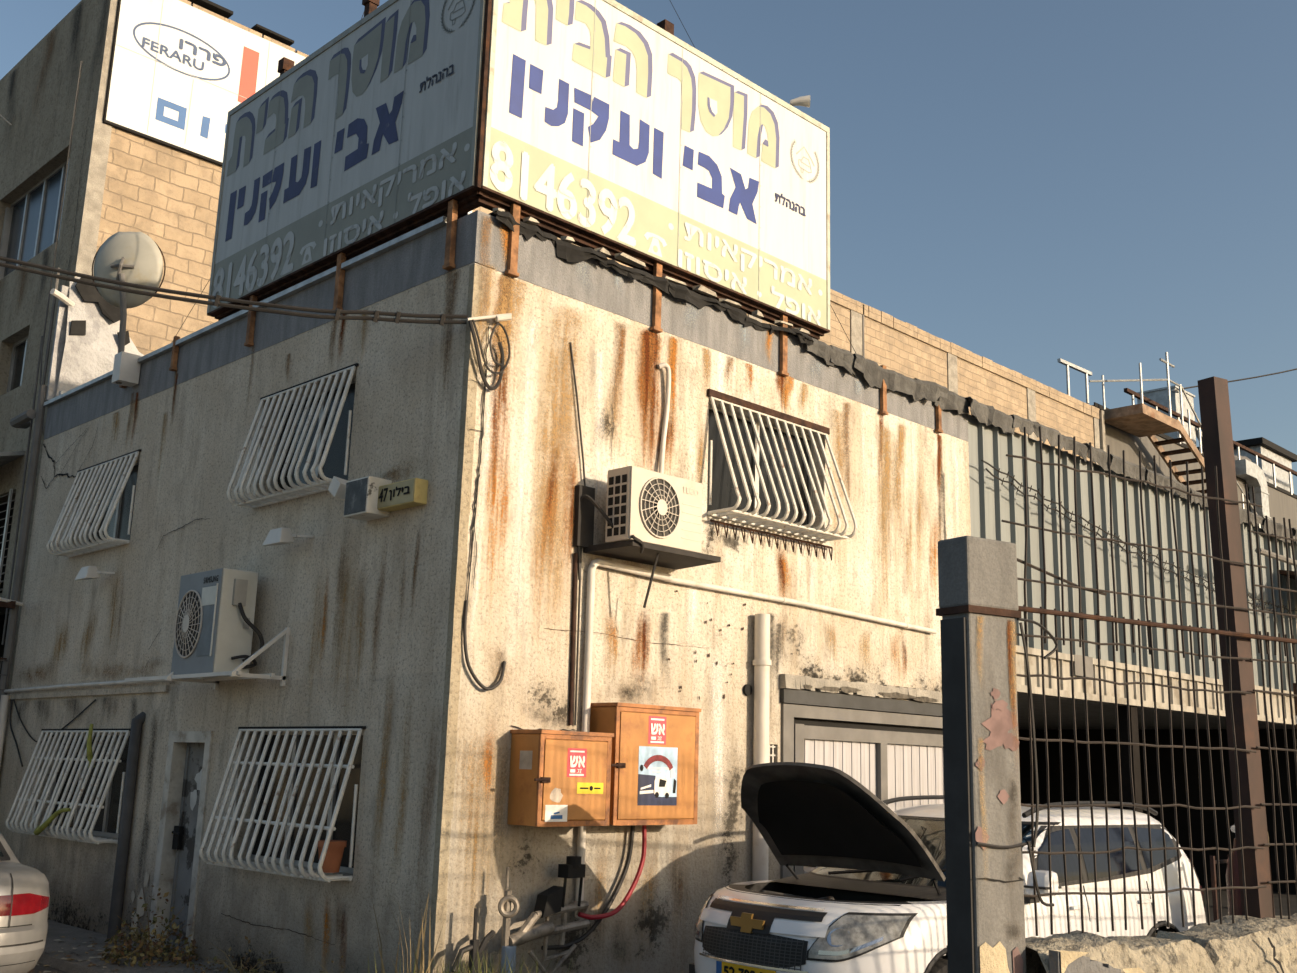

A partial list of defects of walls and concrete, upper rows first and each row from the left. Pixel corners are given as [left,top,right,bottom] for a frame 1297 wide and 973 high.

corrosion [609,324,625,428]
corrosion [639,329,677,453]
crack [42,424,99,489]
corrosion [835,403,850,497]
corrosion [879,415,921,570]
leakage [713,671,744,885]
peeling [975,688,1020,772]
peeling [975,826,989,851]